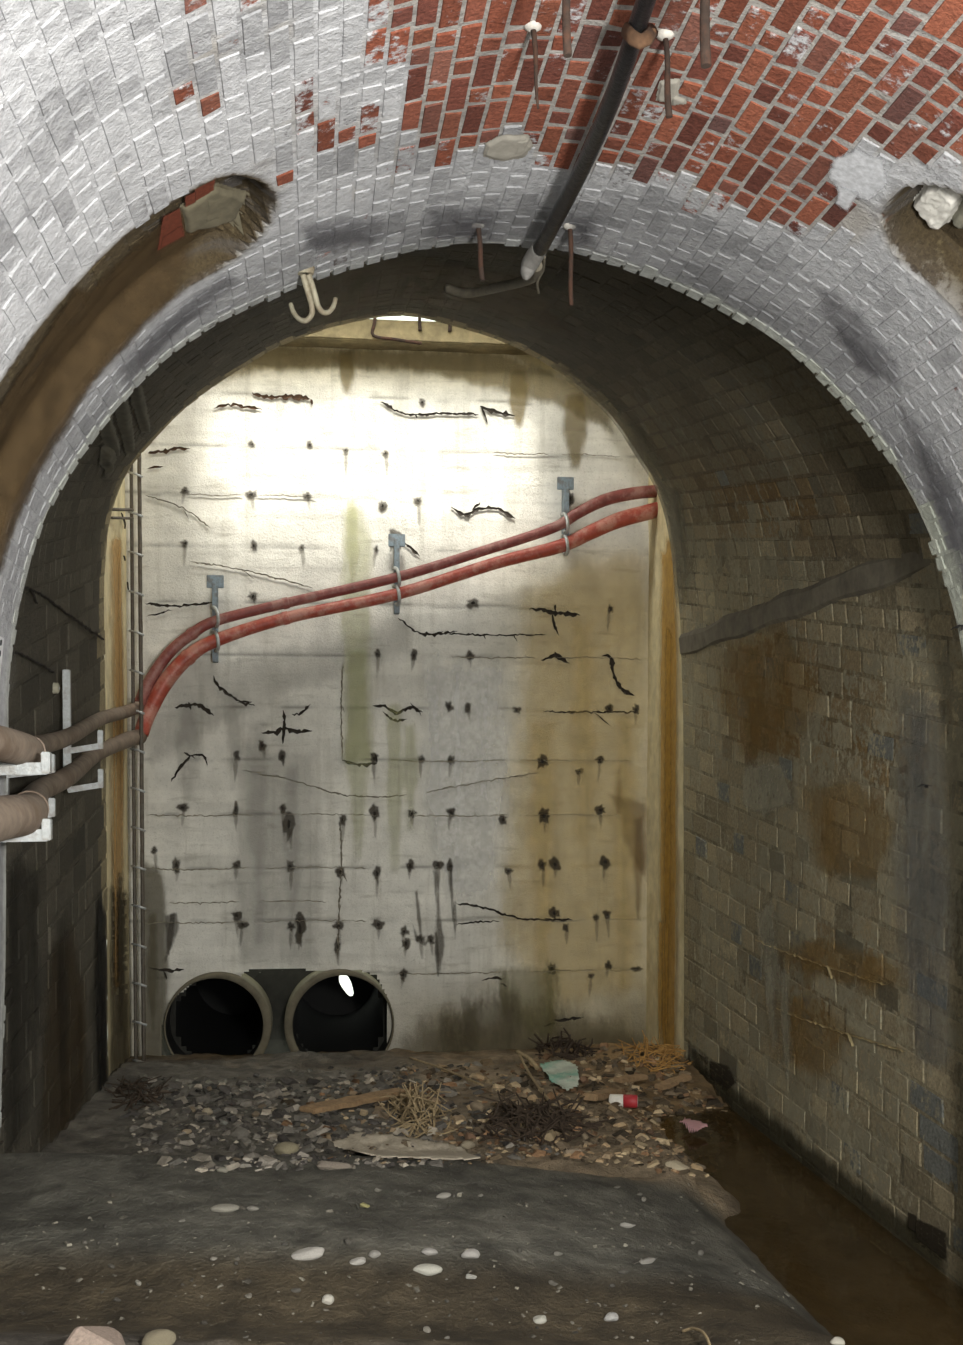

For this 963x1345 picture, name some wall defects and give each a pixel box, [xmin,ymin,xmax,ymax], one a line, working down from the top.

peeling [671,96,687,106]
spalling [157,180,215,251]
crack [214,392,313,410]
leakage [341,352,353,391]
crack [381,402,620,457]
leakage [510,373,526,423]
crack [121,447,313,616]
crack [451,503,514,518]
leakage [565,388,687,590]
crack [398,605,641,725]
crack [146,666,644,958]
leakage [415,872,456,971]